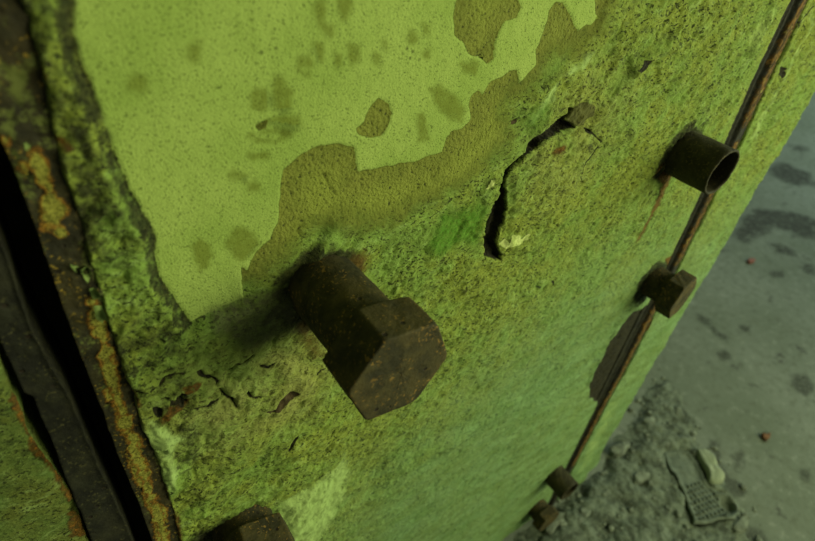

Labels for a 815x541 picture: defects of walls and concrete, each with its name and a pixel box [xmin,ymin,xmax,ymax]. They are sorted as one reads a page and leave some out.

peeling [242,0,609,281]
crack [483,102,602,259]
rust [637,164,671,241]
crack [136,355,275,410]
rust [9,392,86,537]